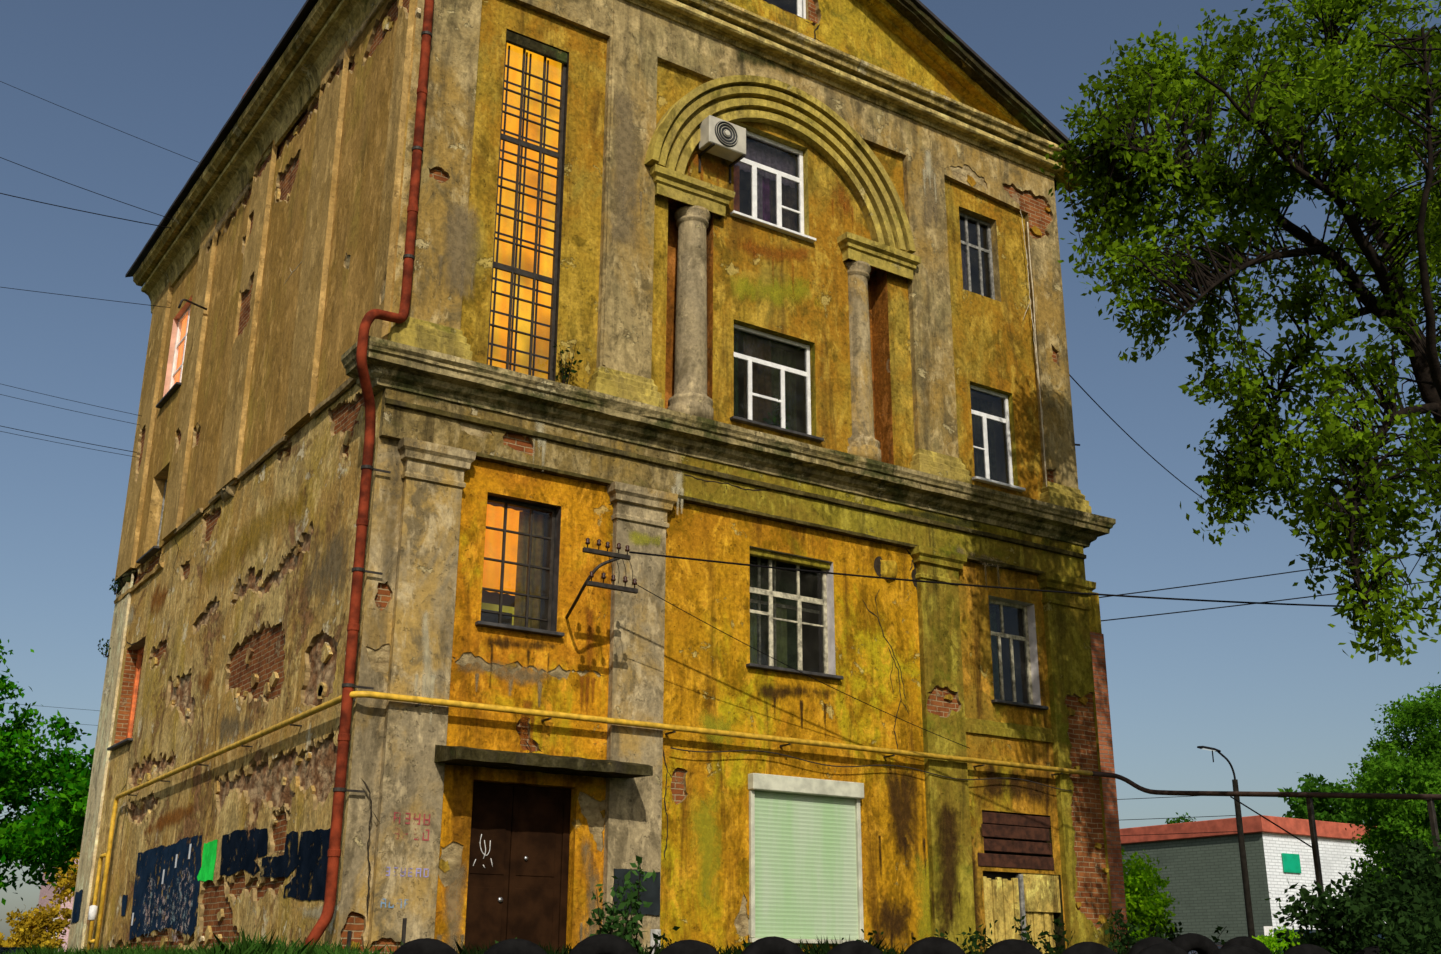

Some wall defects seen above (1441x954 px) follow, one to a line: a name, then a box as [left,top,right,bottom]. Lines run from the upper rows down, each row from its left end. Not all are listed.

flaking render [206,0,421,258]
flaking render [193,521,314,635]
flaking render [225,621,286,707]
flaking render [300,629,339,708]
flaking render [126,749,178,827]
flaking render [212,726,339,855]
water stain [879,770,982,938]
water stain [985,765,1050,803]
flaking render [1065,692,1112,930]
flaking render [104,869,285,952]
flaking render [340,911,407,954]
water stain [876,901,913,947]